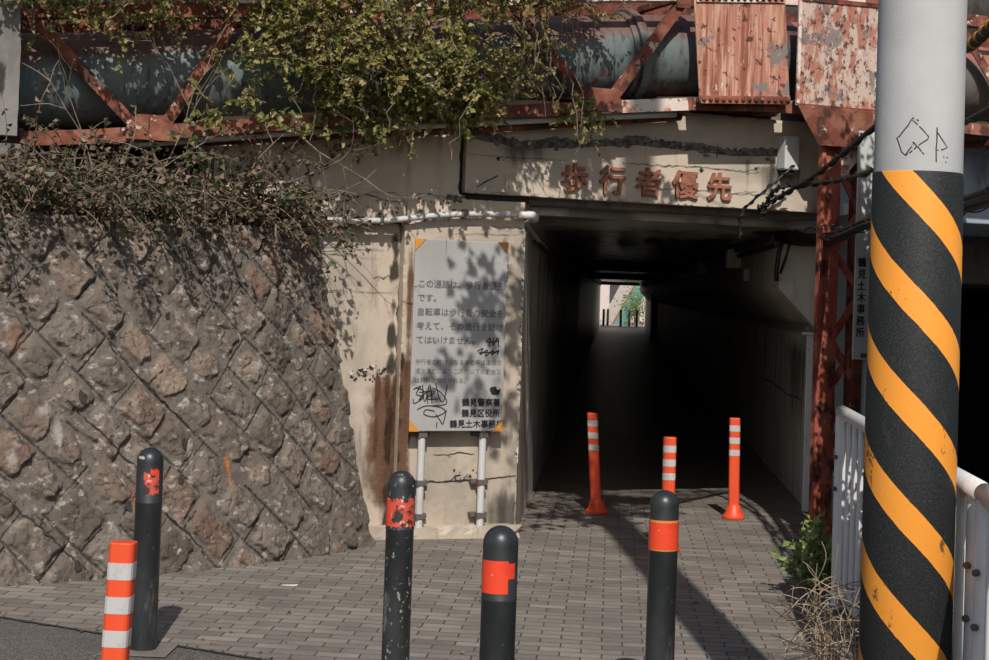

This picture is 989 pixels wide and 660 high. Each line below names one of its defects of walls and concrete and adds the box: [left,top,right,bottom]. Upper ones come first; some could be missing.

rust [366,266,414,505]